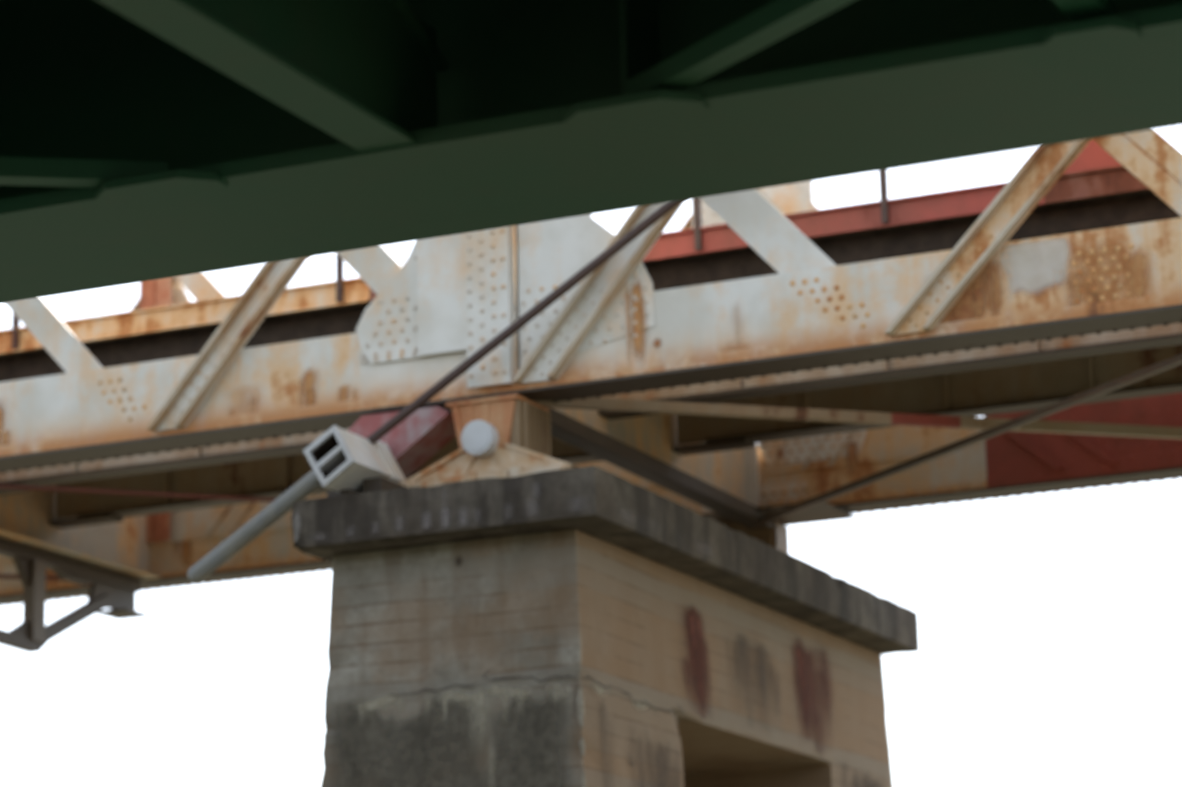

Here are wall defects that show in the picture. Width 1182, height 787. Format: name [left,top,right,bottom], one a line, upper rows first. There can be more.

corrosion [627,283,660,354]
corrosion [940,262,1002,323]
corrosion [300,371,314,406]
crack [385,668,686,717]
corrosion [686,608,707,713]
corrosion [794,641,829,731]
leakage [336,684,569,787]